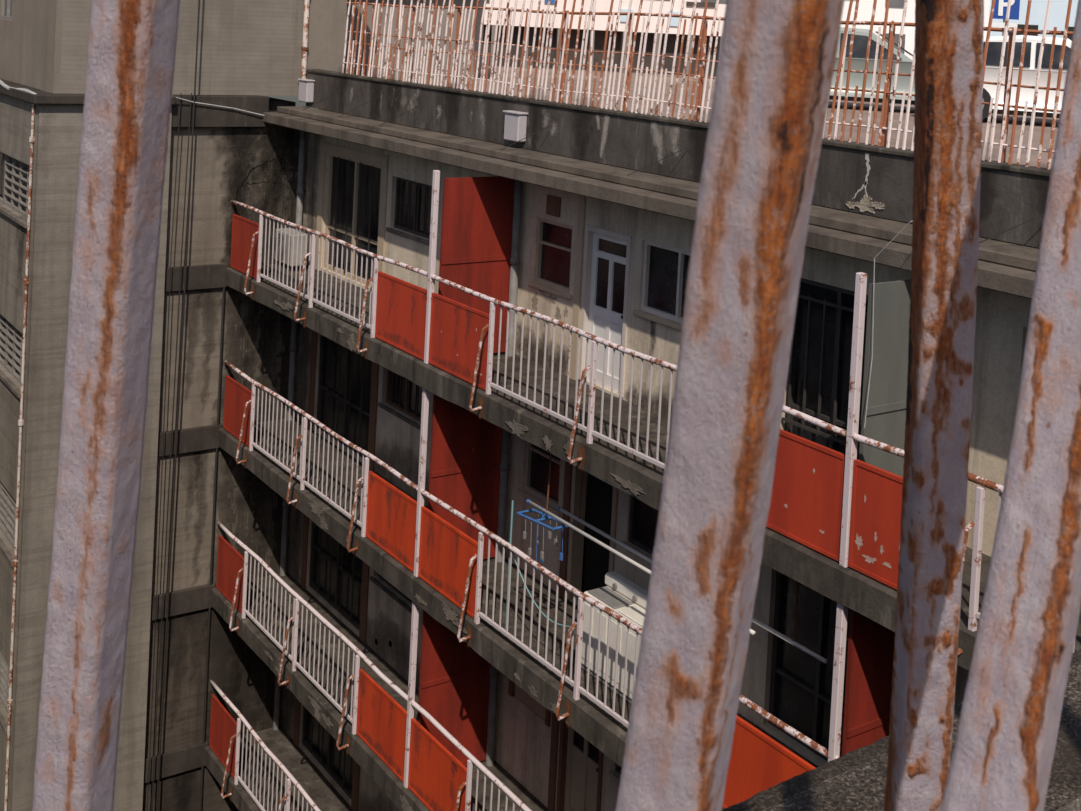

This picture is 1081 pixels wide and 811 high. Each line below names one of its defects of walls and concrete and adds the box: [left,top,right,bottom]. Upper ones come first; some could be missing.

damp [576,105,610,157]
damp [651,122,679,162]
damp [692,127,708,171]
peeling [855,533,892,568]